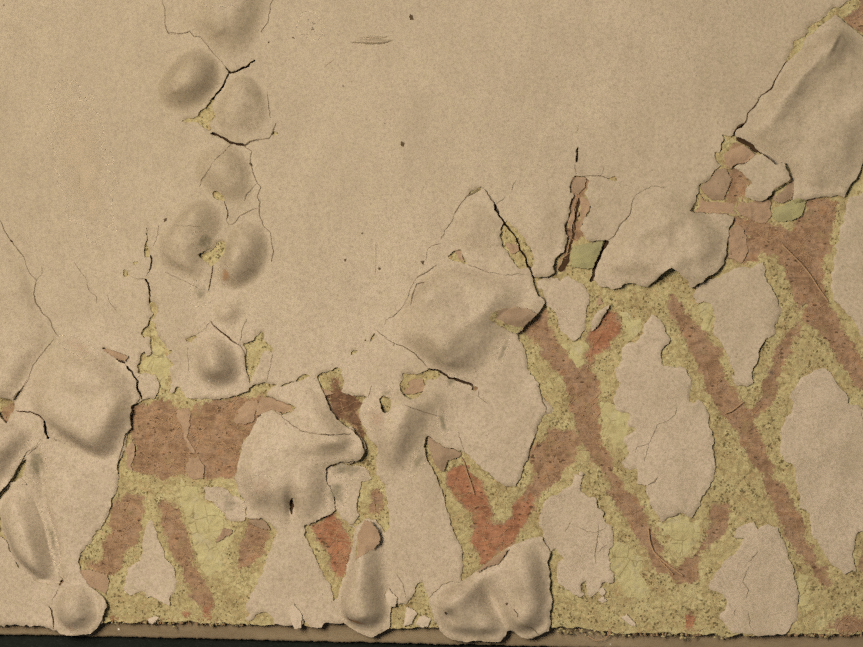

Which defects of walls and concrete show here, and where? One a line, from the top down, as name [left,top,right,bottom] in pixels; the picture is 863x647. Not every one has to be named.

crack [162,1,255,100]
peeling [786,0,863,61]
peeling [182,99,215,131]
crack [200,93,276,261]
crack [558,198,580,272]
crack [590,186,659,282]
crack [377,180,536,402]
crack [103,347,144,400]
peeling [400,370,441,400]
peeling [424,134,863,637]
peeling [79,301,391,629]
peeling [385,582,439,629]